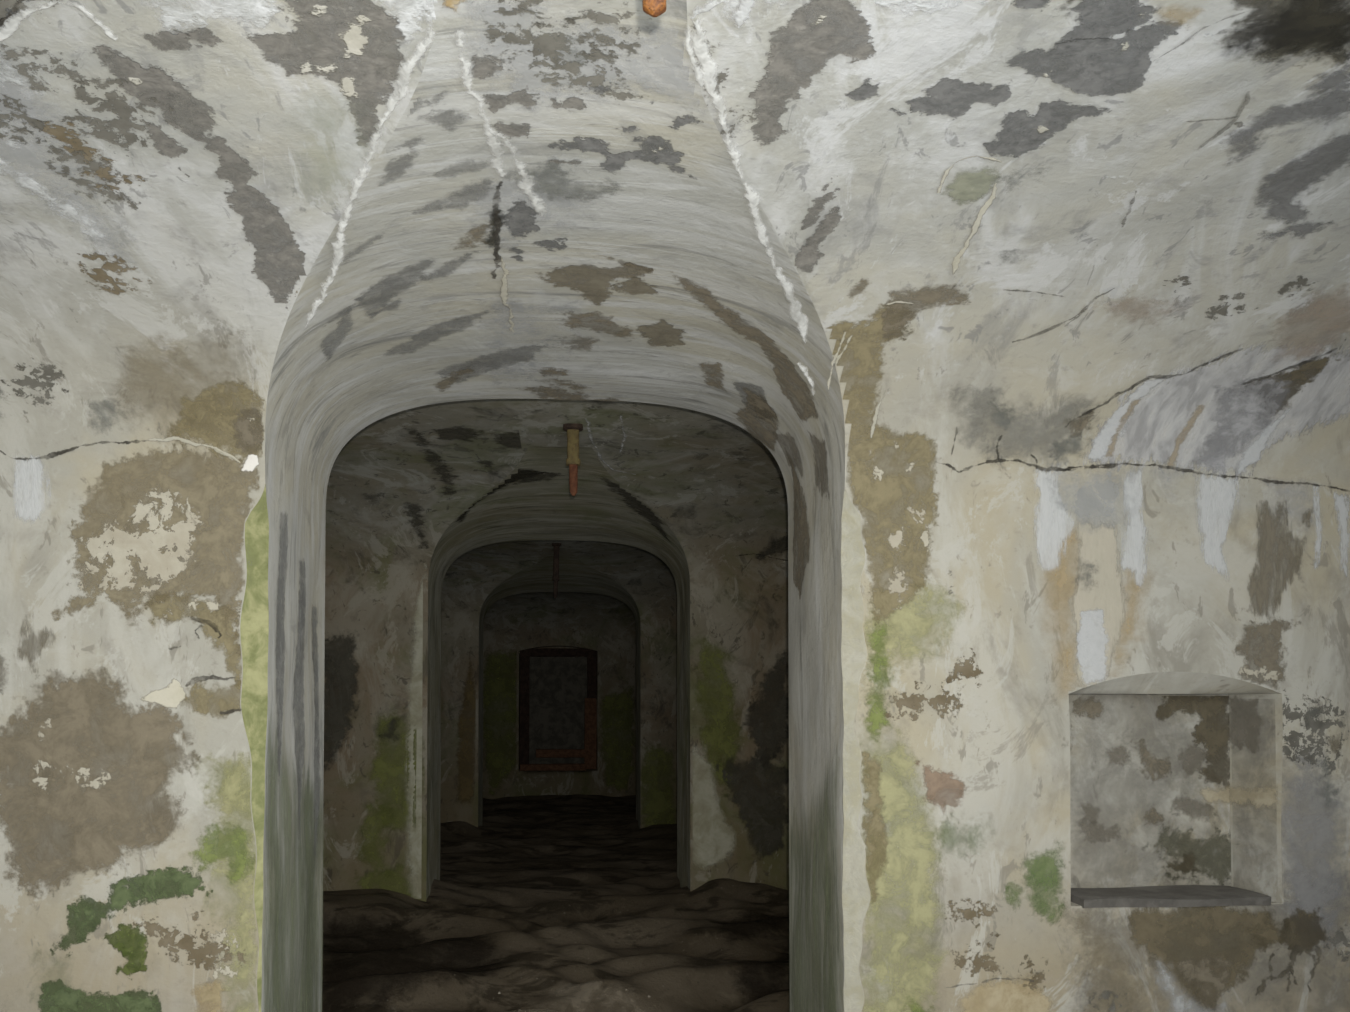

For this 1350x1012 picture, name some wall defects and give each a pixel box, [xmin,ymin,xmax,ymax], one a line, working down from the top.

crack [0,0,117,41]
water stain [410,93,465,130]
water stain [380,139,420,186]
crack [458,31,546,332]
crack [1065,339,1346,428]
crack [0,436,240,463]
water stain [827,285,968,623]
crack [945,435,1346,491]
water stain [971,344,1350,718]
peeling [146,595,242,683]
peeling [141,679,185,708]
water stain [693,652,789,866]